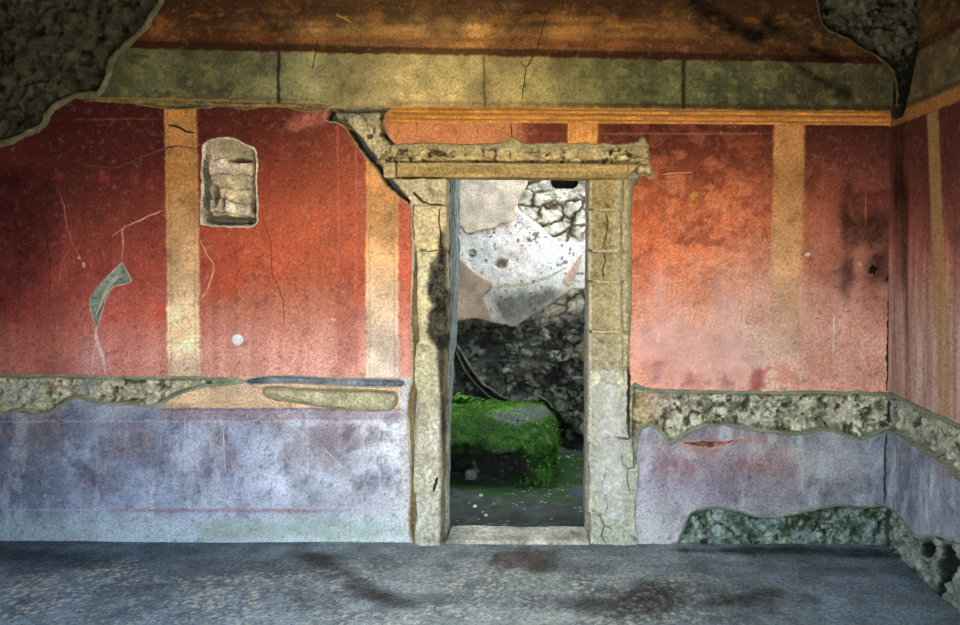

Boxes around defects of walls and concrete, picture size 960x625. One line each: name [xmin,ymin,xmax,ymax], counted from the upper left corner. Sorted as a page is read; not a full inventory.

crack [521,11,547,103]
flaking render [816,0,922,107]
flaking render [0,0,654,234]
crack [601,214,609,278]
flaking render [0,374,246,416]
crack [592,366,635,544]
rust [680,437,751,449]
flaking render [630,382,960,482]
flaking render [671,503,960,614]